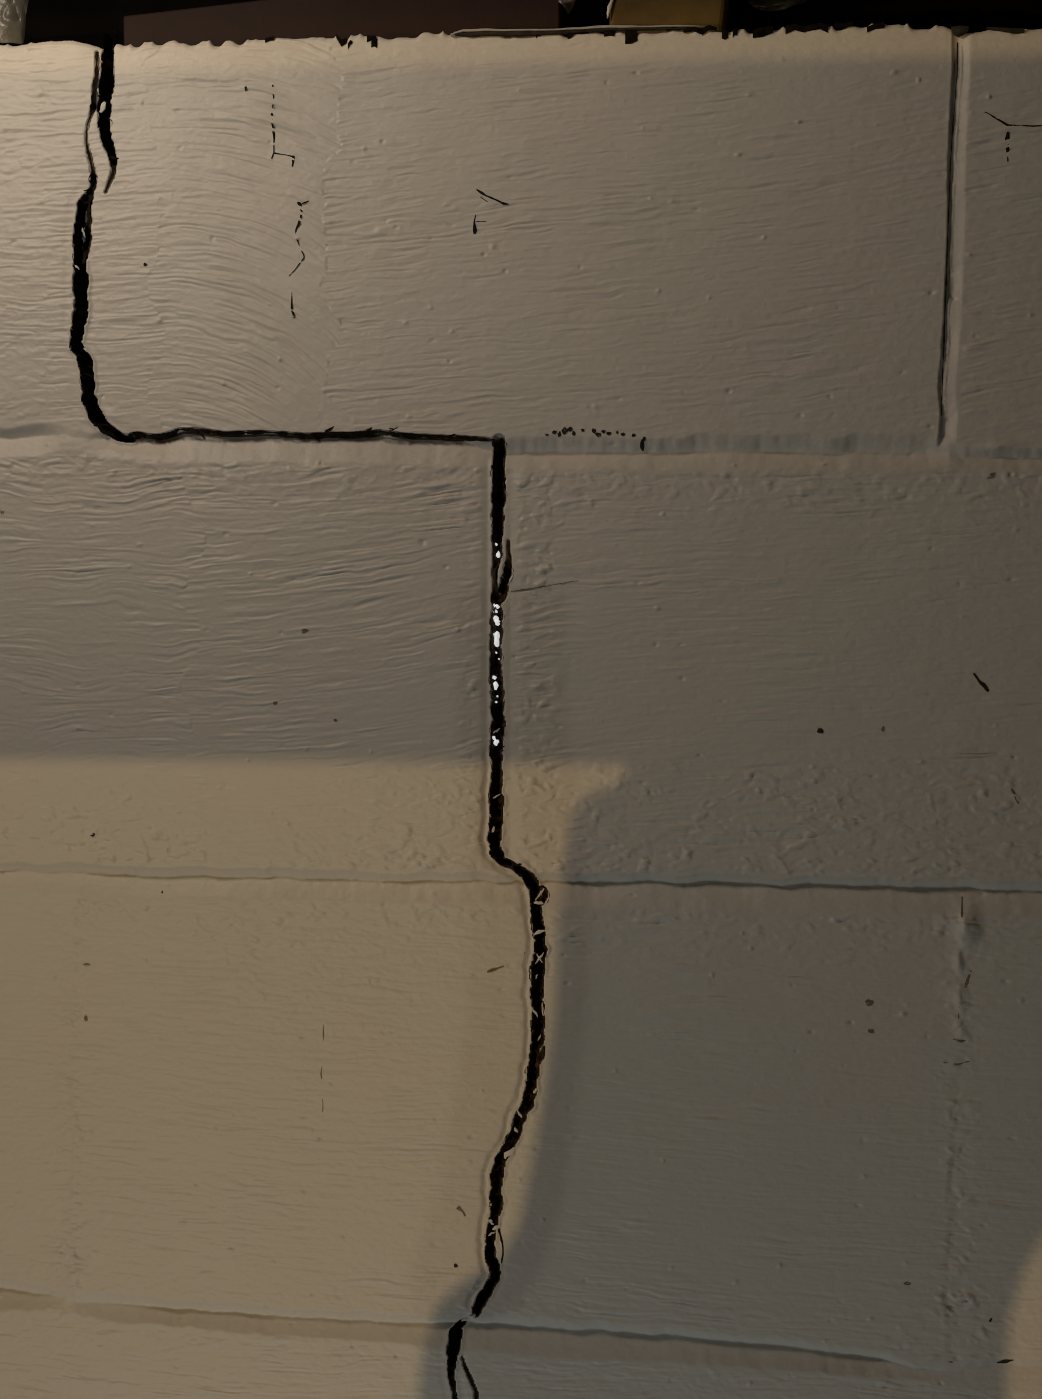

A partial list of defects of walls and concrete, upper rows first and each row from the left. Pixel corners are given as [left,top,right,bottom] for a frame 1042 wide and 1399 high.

crack [69,31,578,1399]